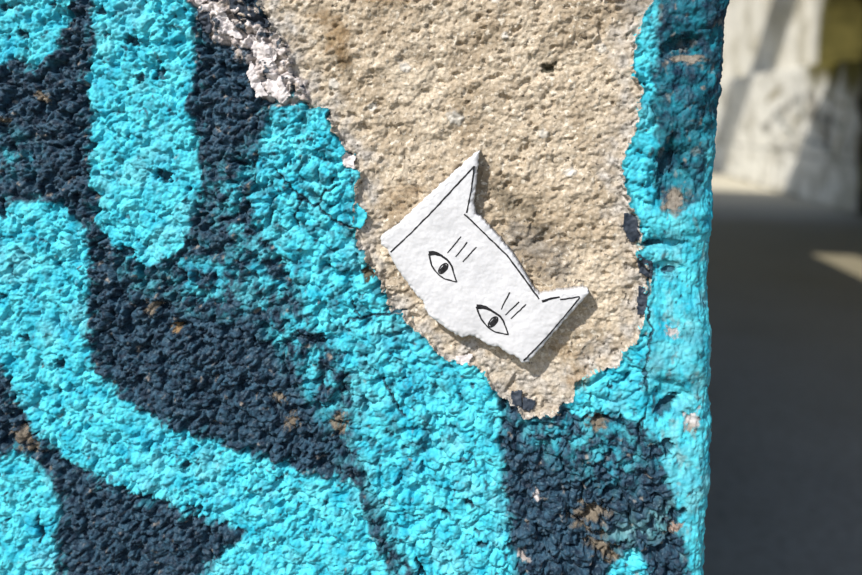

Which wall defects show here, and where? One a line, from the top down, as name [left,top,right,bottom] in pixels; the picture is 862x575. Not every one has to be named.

spalling [137,68,166,84]
spalling [157,169,174,183]
crack [275,169,354,228]
spalling [188,0,654,420]
peeling [144,299,163,315]
crack [642,277,654,391]
peeling [585,413,607,431]